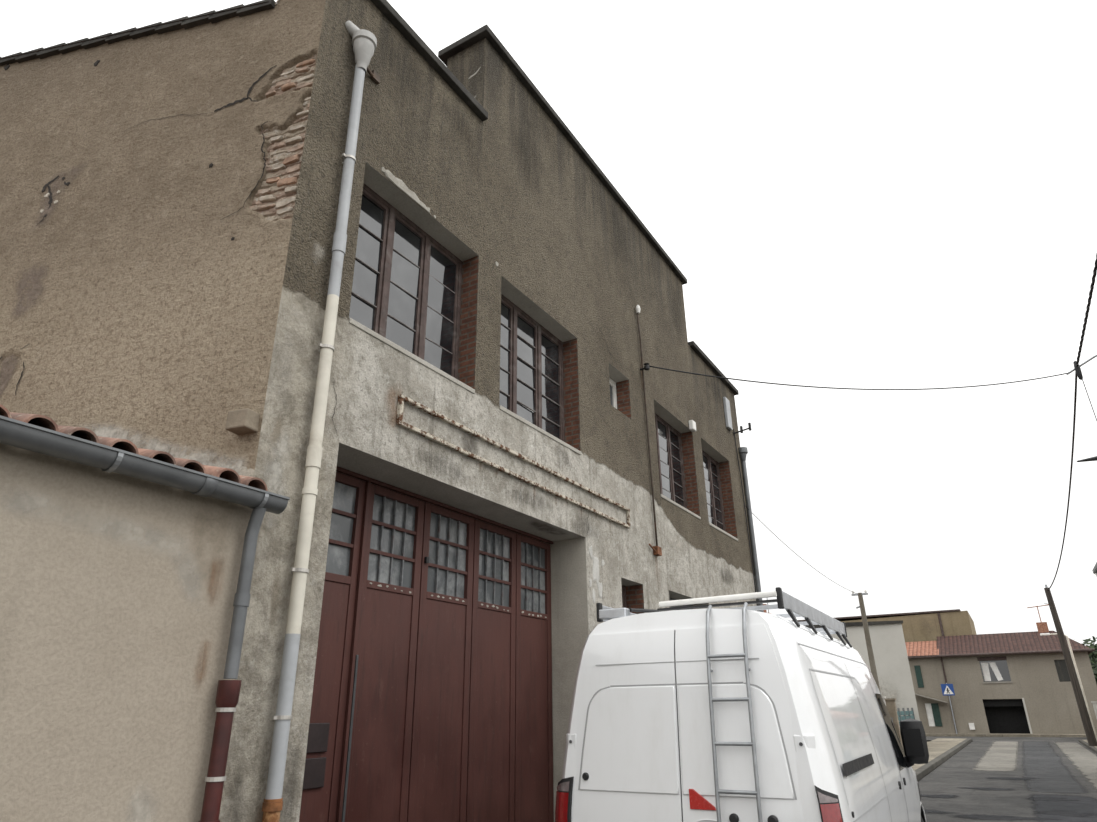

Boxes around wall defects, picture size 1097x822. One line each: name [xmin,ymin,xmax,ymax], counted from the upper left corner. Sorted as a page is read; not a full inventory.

flaking render [36,175,70,226]
crack [128,65,277,220]
flaking render [249,54,317,221]